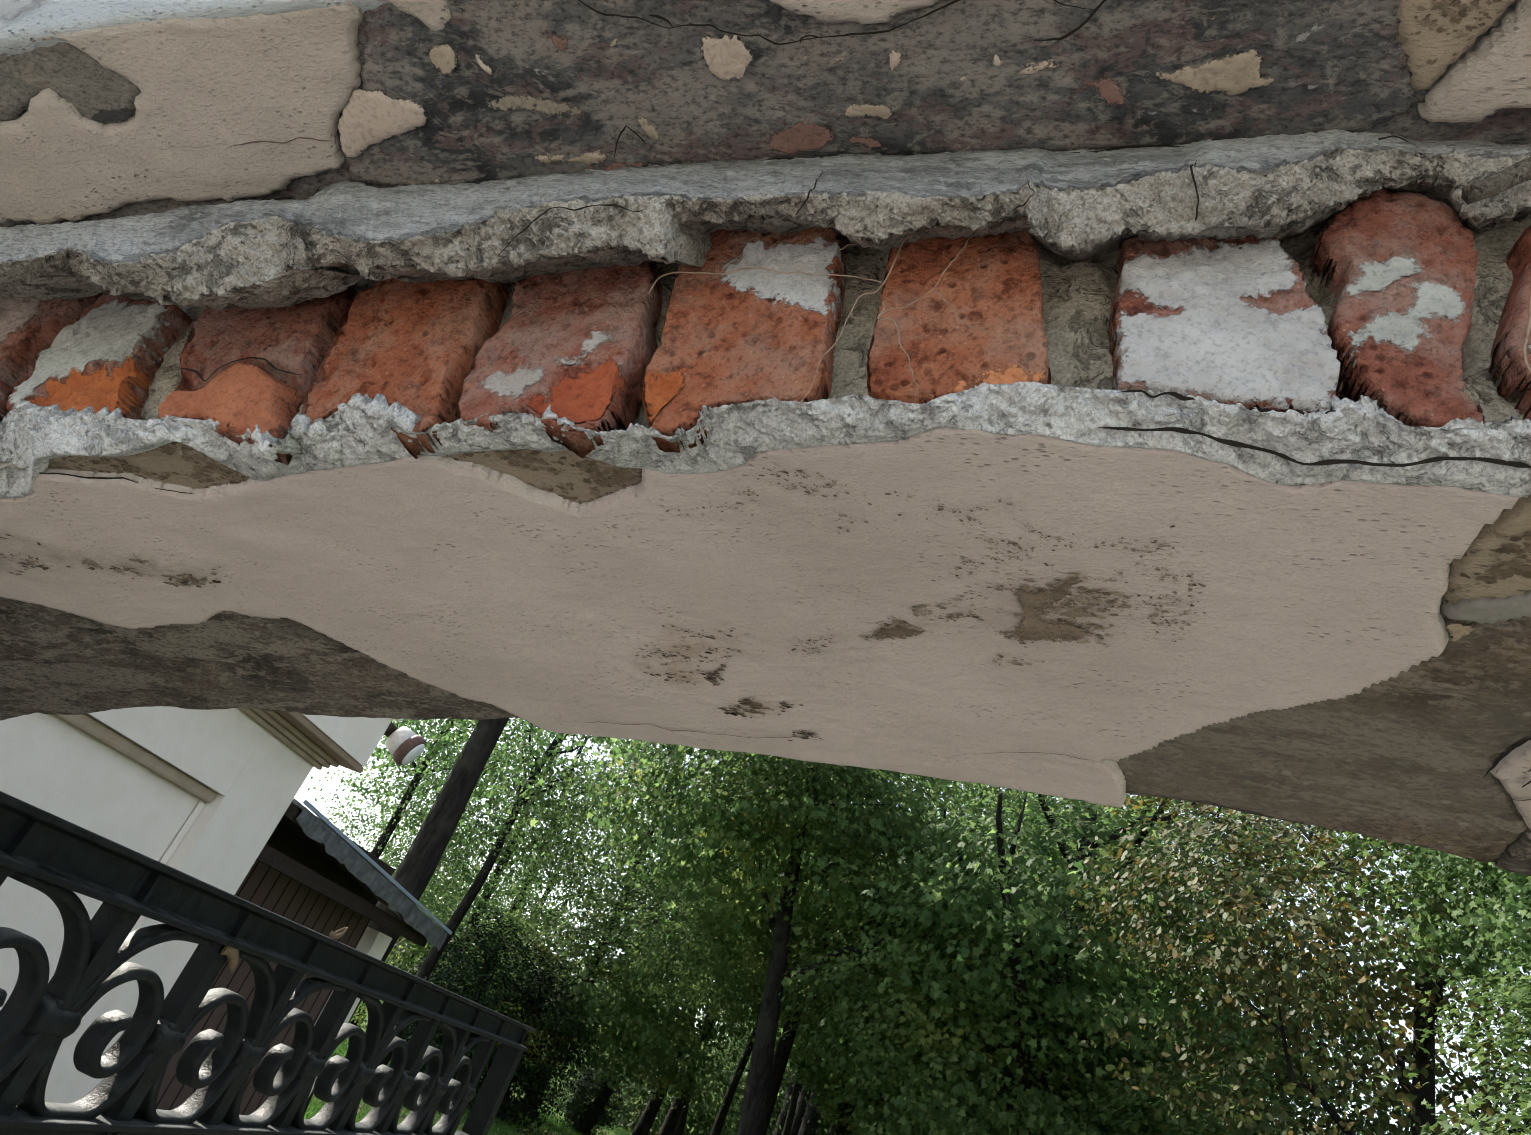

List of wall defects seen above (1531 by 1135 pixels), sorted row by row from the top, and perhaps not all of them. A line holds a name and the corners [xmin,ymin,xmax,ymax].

crack [578,0,960,45]
crack [1034,0,1106,41]
flaking render [0,0,1531,310]
spalling [0,355,1531,605]
crack [1099,390,1531,469]
damp [666,467,1206,666]
flaking render [0,597,519,720]
flaking render [1116,616,1531,876]
crack [1484,737,1531,801]